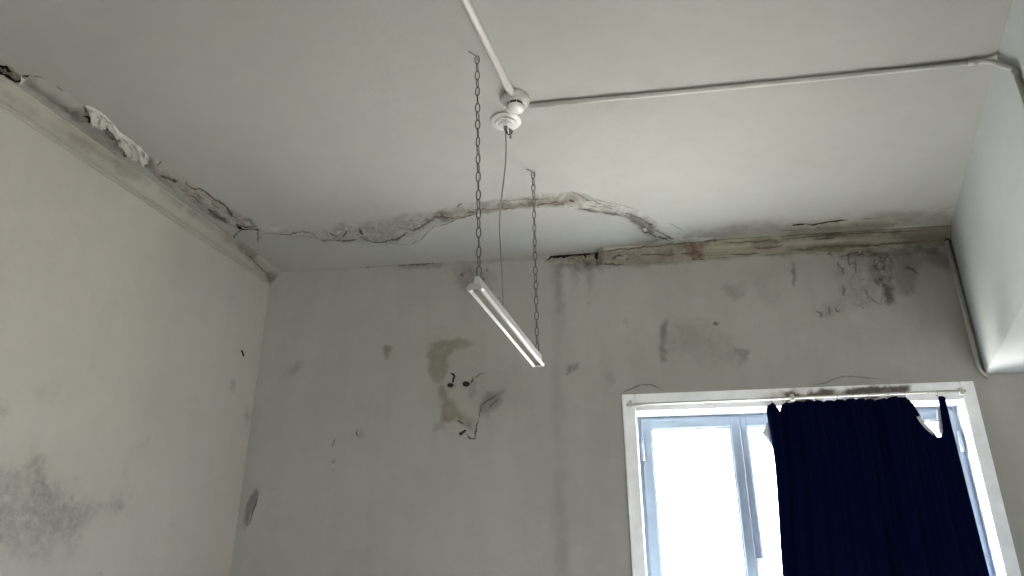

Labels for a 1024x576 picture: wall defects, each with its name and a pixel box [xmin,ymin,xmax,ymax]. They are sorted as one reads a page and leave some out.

peeling [0,58,150,168]
crack [149,157,683,268]
spalling [596,236,717,269]